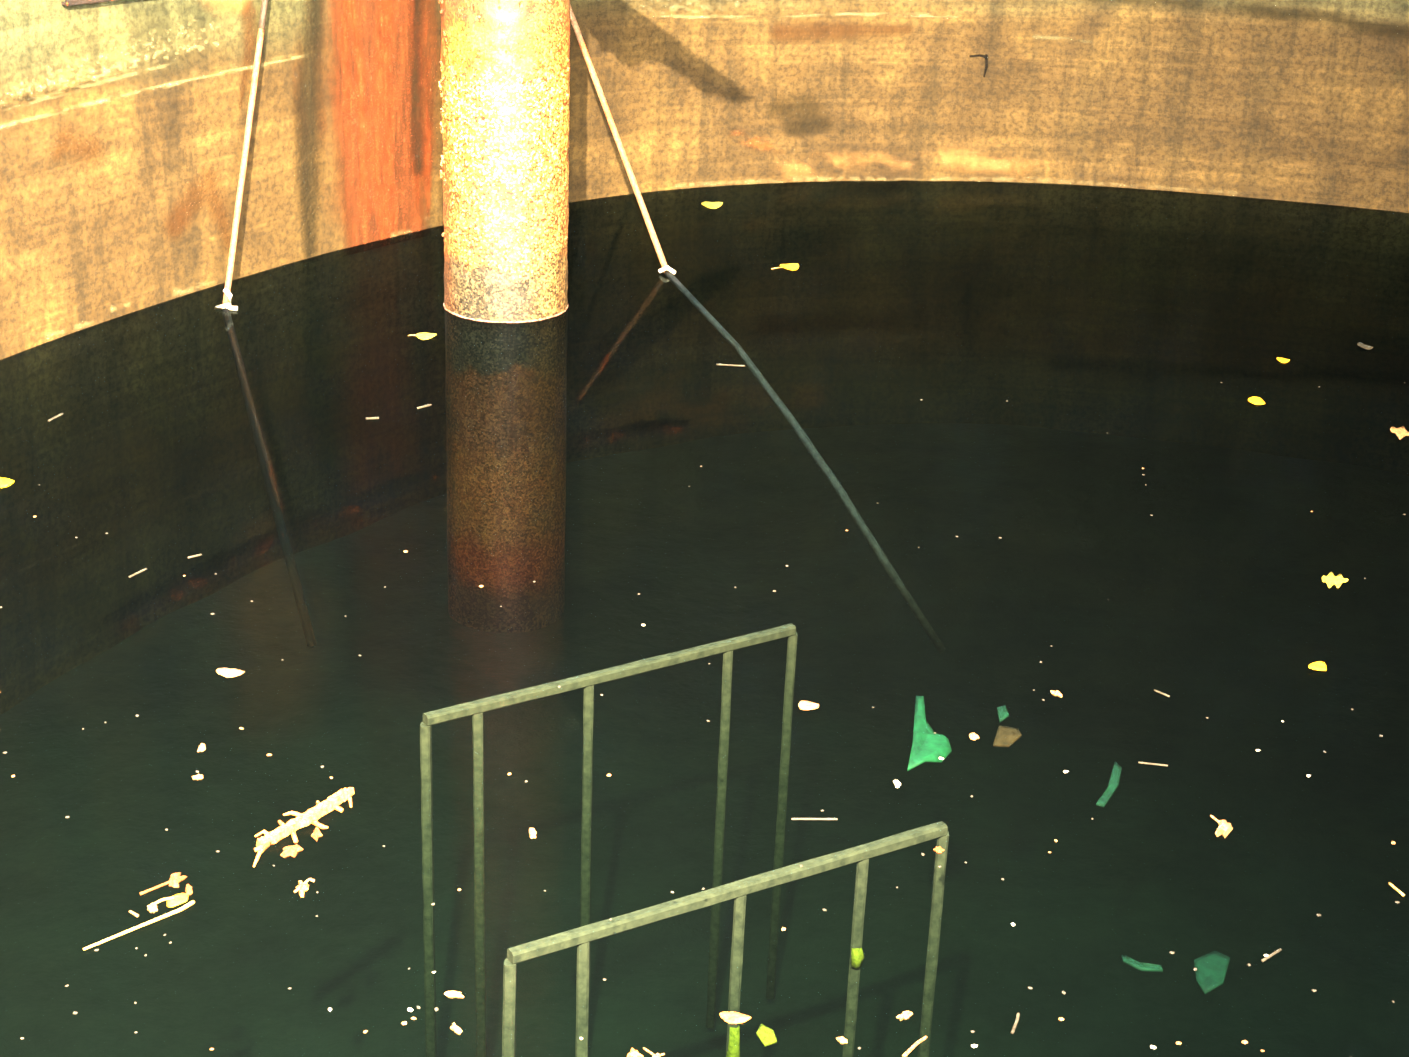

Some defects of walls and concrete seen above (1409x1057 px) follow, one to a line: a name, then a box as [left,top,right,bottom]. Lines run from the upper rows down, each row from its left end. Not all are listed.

rust [300,0,433,255]